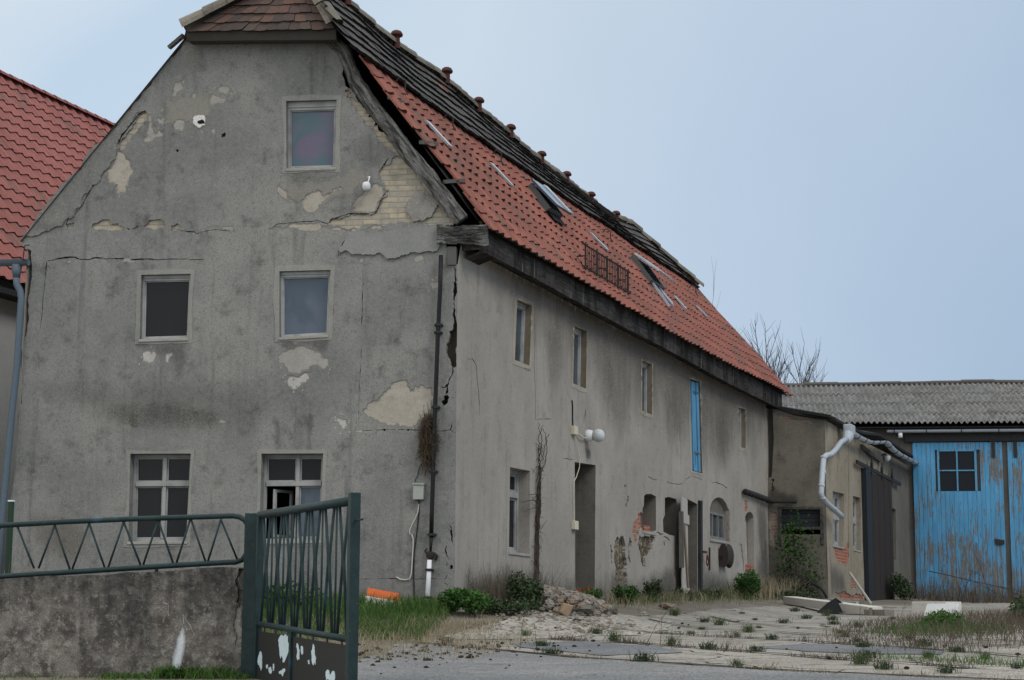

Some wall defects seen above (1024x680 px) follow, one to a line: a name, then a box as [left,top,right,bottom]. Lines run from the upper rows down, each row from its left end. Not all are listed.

peeling [105,77,234,197]
spalling [272,88,453,237]
peeling [278,342,332,393]
peeling [362,374,433,430]
crack [447,269,457,393]
spalling [614,513,653,588]